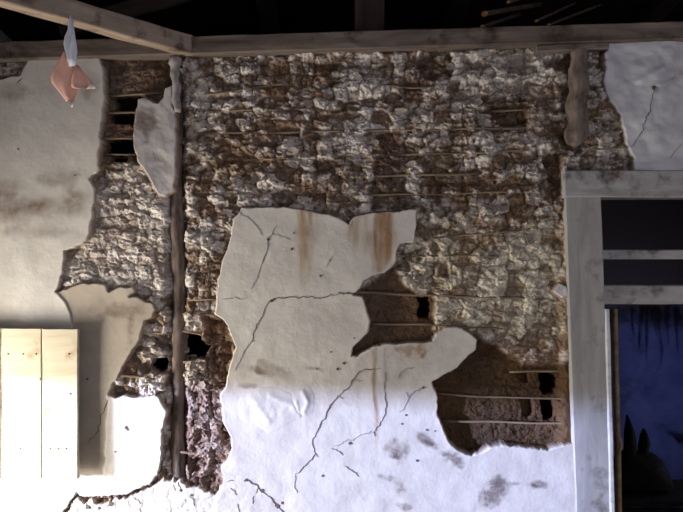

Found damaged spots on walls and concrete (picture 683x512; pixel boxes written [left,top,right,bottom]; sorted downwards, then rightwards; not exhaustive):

crack [633,84,656,146]
crack [223,213,295,300]
spalling [60,48,630,502]
crack [235,292,355,370]
crack [294,350,429,491]